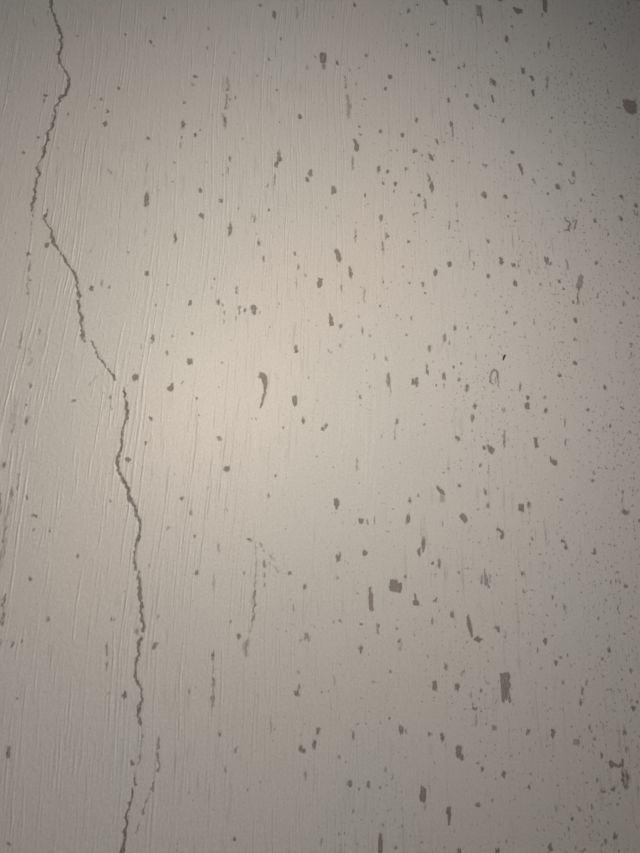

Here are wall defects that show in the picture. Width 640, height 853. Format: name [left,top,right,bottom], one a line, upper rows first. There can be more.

crack [31,0,145,725]
crack [120,778,154,853]